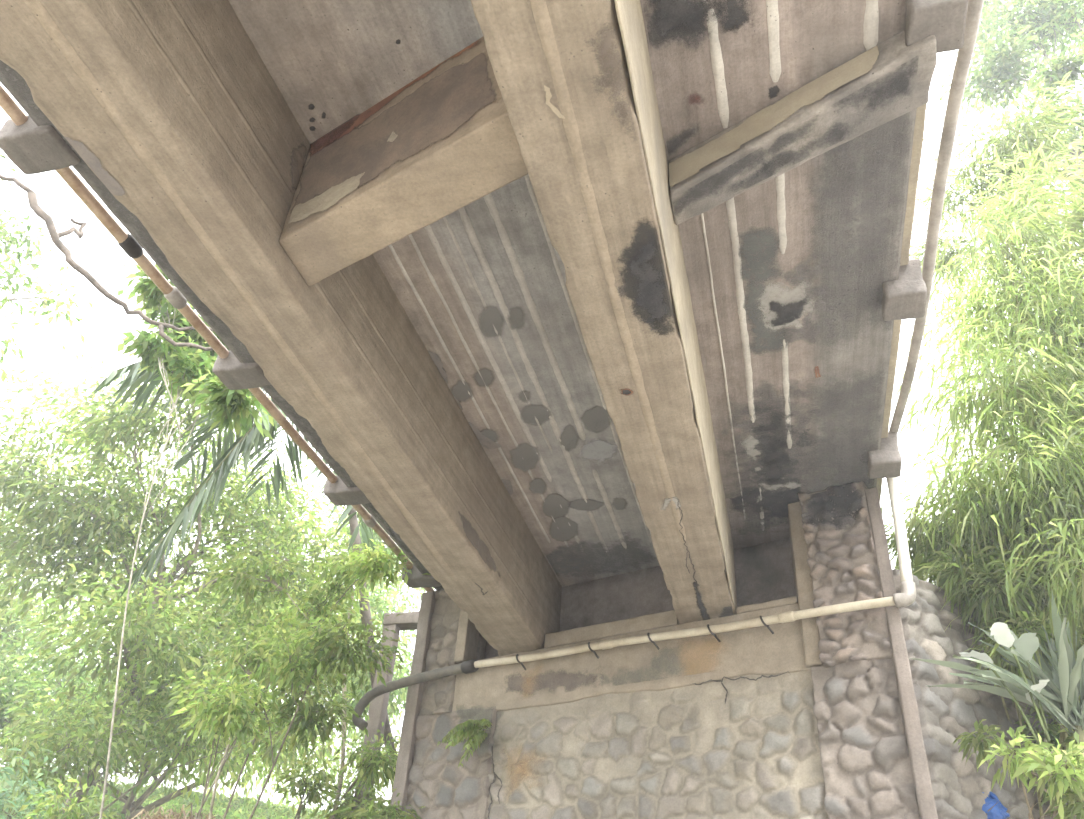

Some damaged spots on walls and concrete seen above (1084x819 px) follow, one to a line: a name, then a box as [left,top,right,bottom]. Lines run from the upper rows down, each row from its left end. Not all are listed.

leakage [647,0,749,47]
peeling [288,52,496,224]
leakage [617,221,675,335]
hole [760,265,815,342]
leakage [674,117,909,354]
leakage [510,443,651,577]
leakage [560,406,616,462]
crack [663,497,710,620]
leakage [724,377,880,533]
leakage [505,649,680,695]
crack [693,671,788,703]
crack [488,720,502,818]